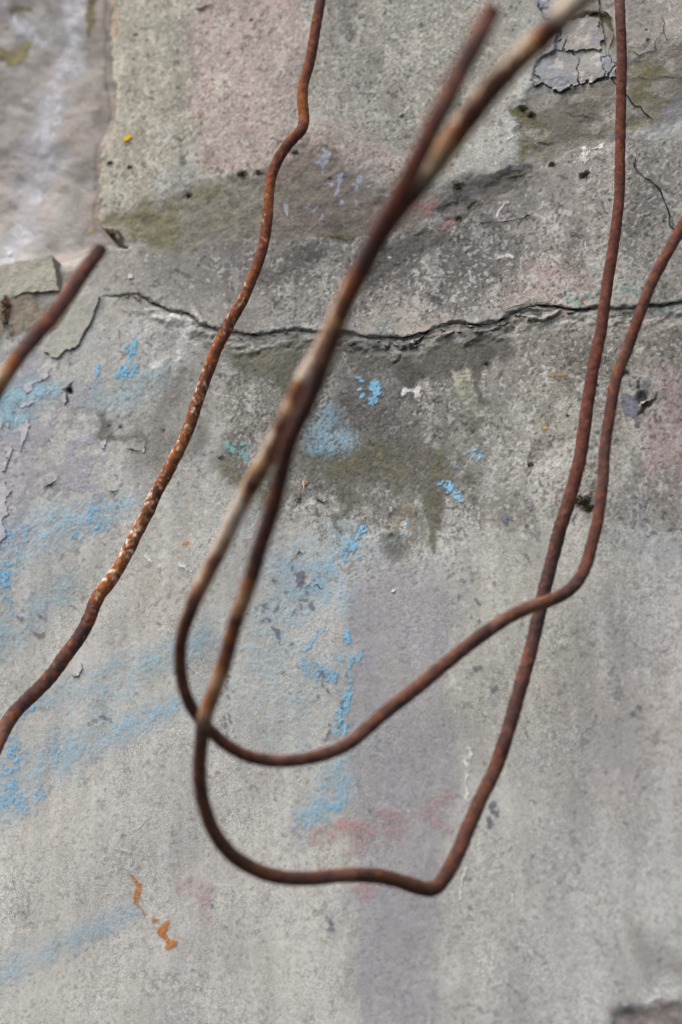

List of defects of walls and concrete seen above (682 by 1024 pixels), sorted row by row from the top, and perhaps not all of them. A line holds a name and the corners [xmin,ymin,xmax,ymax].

crack [107,294,321,339]
crack [347,301,682,363]
spalling [0,0,326,754]
damp [329,329,513,443]
spalling [174,0,682,897]
damp [417,485,444,550]
rust [130,875,177,949]